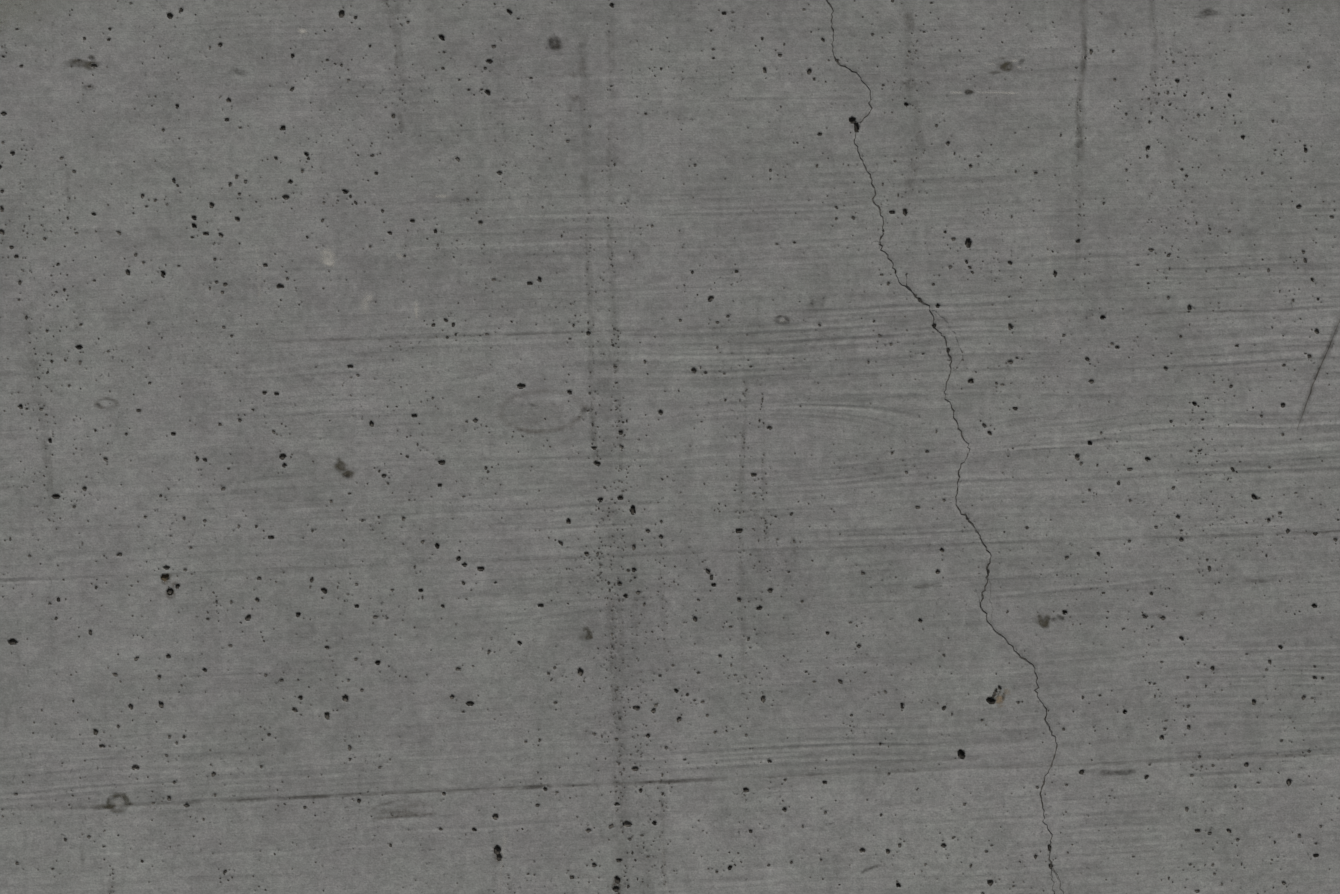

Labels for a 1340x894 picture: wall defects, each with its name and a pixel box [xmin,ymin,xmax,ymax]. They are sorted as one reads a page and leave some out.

crack [827,0,1064,894]